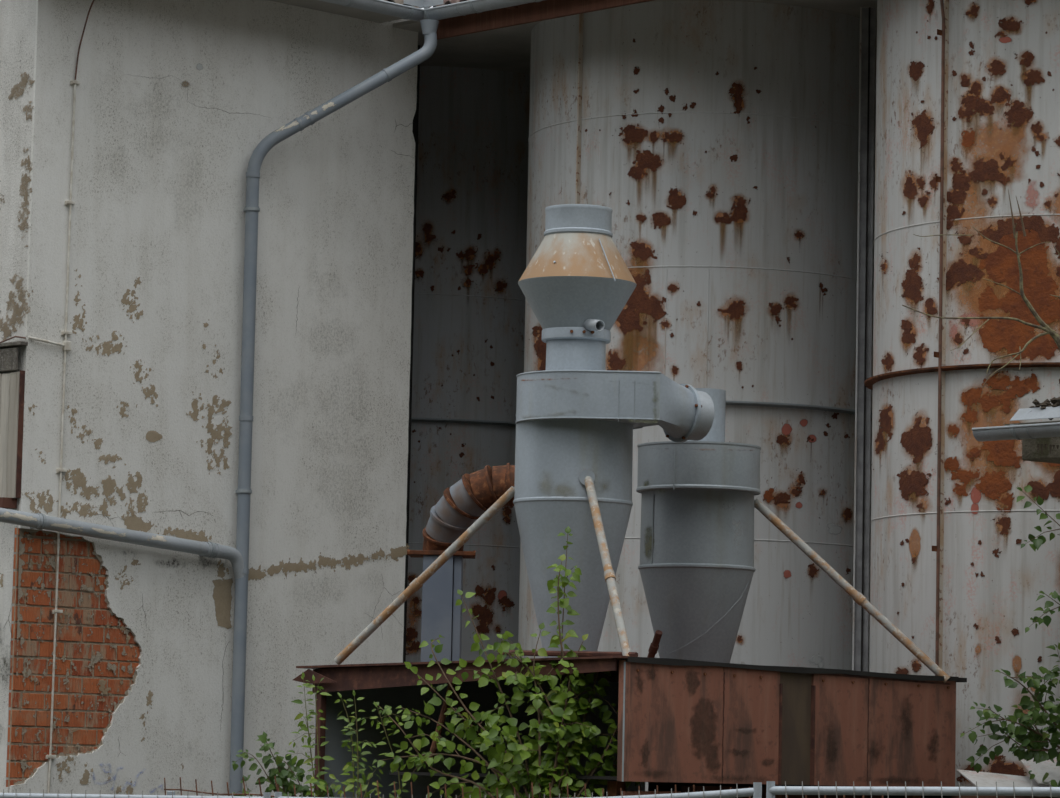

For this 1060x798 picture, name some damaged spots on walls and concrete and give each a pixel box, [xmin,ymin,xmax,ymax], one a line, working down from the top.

corrosion [636,186,697,232]
corrosion [715,186,758,236]
peeling [70,269,127,356]
corrosion [606,241,684,371]
corrosion [717,298,745,328]
corrosion [871,51,1060,558]
peeling [117,359,158,418]
peeling [186,393,232,475]
corrosion [763,470,806,510]
flaking render [0,405,212,795]
peeling [212,559,233,629]
spalling [164,764,279,797]